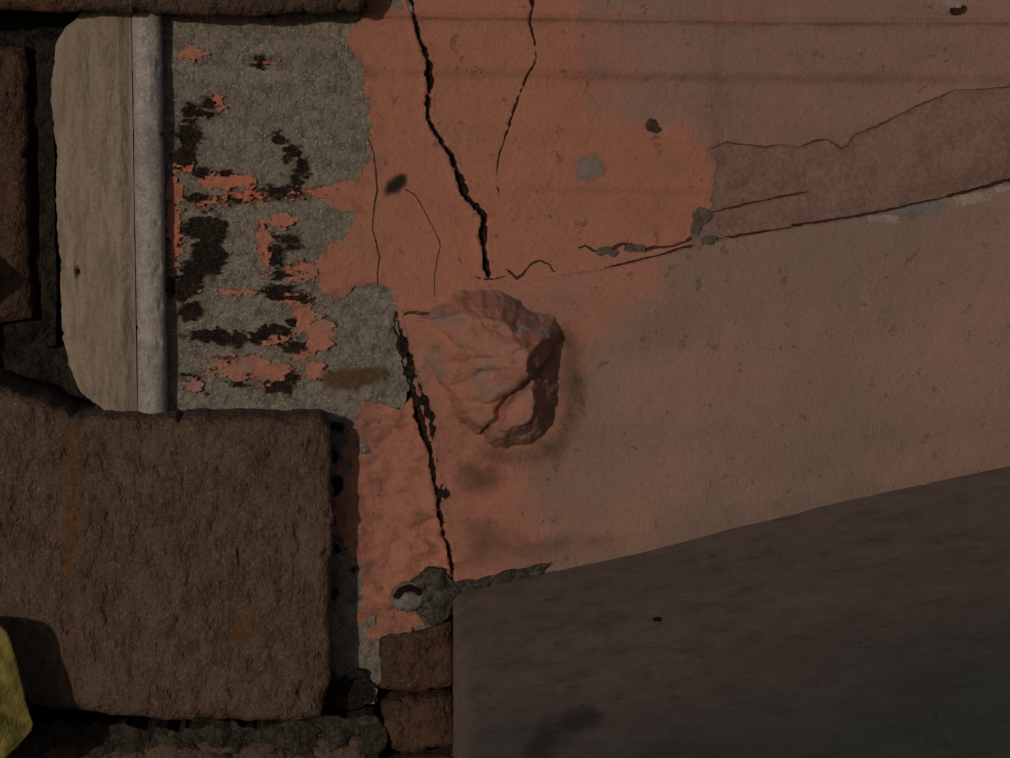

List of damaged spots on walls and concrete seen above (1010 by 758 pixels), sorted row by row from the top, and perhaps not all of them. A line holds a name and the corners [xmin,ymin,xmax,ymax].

peeling [177,45,210,62]
spalling [249,53,280,70]
spalling [164,94,410,408]
crack [367,137,380,286]
crack [409,0,536,280]
spalling [578,85,1010,257]
crack [393,188,454,581]
spalling [331,446,344,497]
spalling [324,668,378,710]